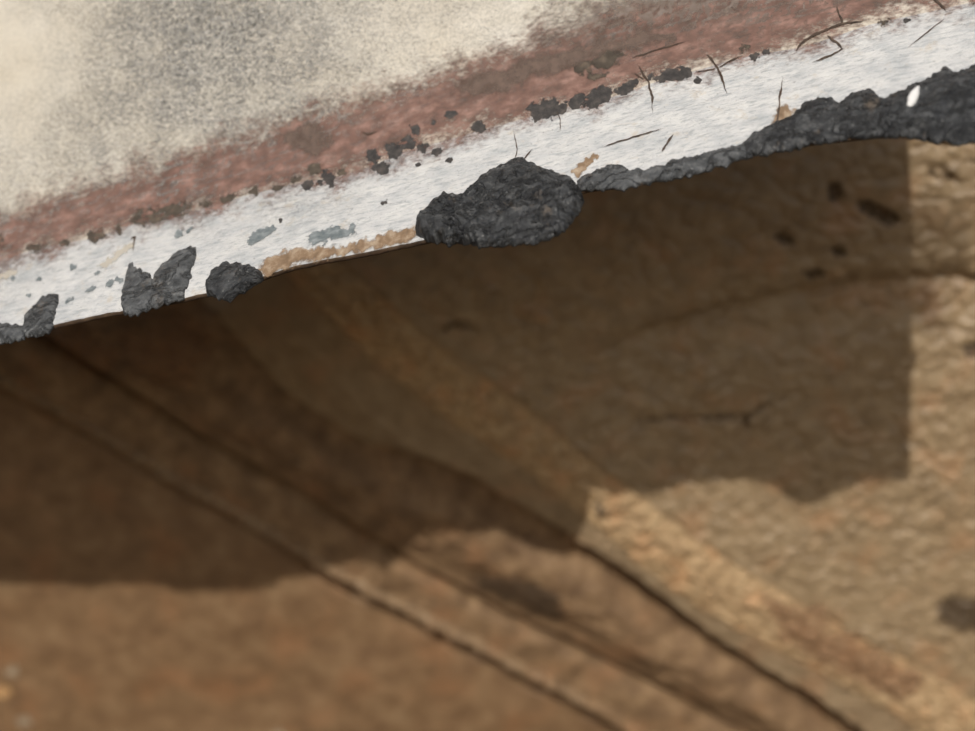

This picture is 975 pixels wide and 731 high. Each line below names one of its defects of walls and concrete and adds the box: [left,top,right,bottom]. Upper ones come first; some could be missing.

water stain [455,25,702,123]
water stain [272,121,347,191]
water stain [366,124,453,175]
water stain [470,120,486,133]
rust [571,153,599,178]
rust [773,104,797,123]
water stain [86,193,236,244]
rust [258,227,416,277]
peeling [85,243,196,318]
peeling [205,261,264,303]
peeling [0,293,74,345]
peeling [0,374,585,705]